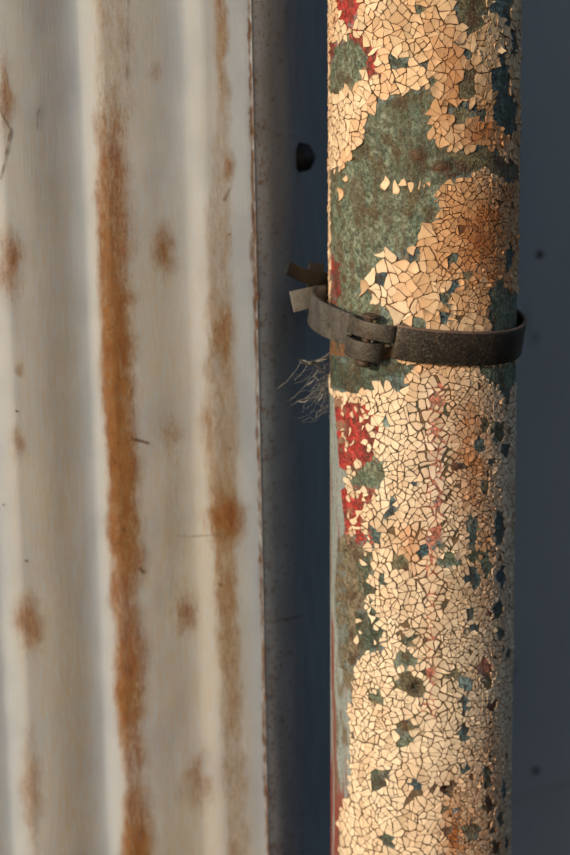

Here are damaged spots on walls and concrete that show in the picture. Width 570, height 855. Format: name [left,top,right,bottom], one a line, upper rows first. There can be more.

peeling [327,0,522,331]
crack [327,0,523,331]
corrosion [95,118,152,855]
corrosion [208,392,242,687]
corrosion [247,1,283,853]
peeling [364,765,391,803]
peeling [378,816,402,850]
crack [328,359,517,855]
peeling [330,355,517,675]
peeling [368,627,496,749]
spalling [439,762,471,819]
peeling [462,757,509,849]